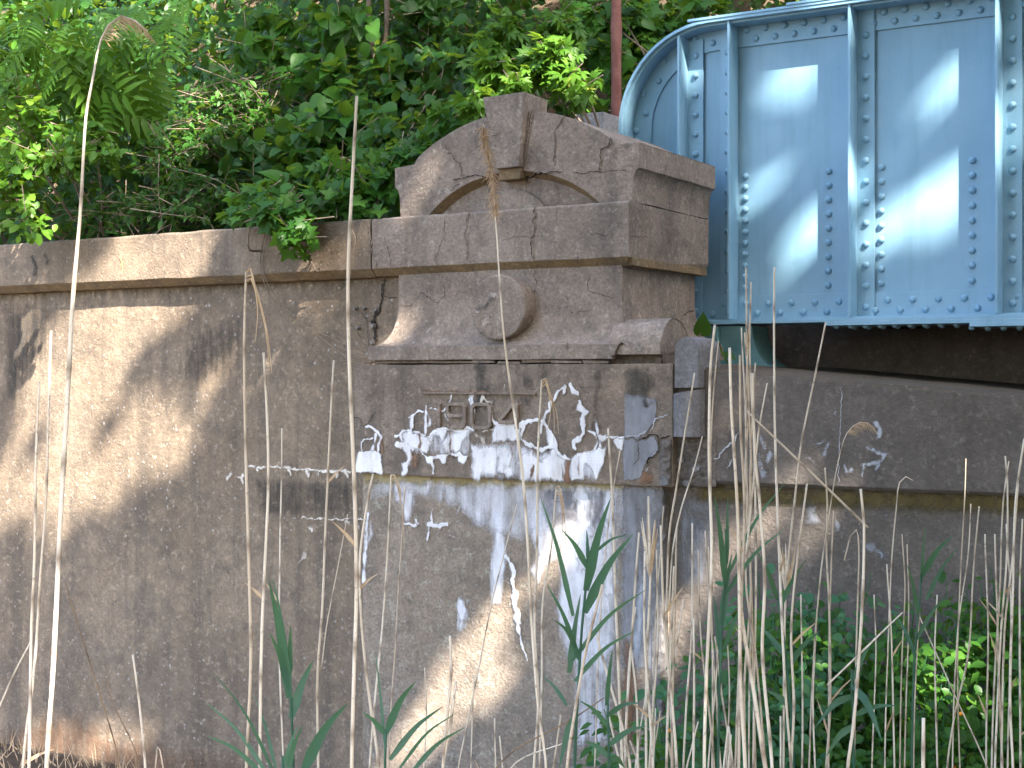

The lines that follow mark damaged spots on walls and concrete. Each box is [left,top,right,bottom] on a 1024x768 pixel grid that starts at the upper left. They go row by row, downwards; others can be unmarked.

crack [353,227,445,345]
crack [435,211,471,260]
crack [421,131,502,196]
crack [502,110,621,292]
water stain [248,364,656,742]